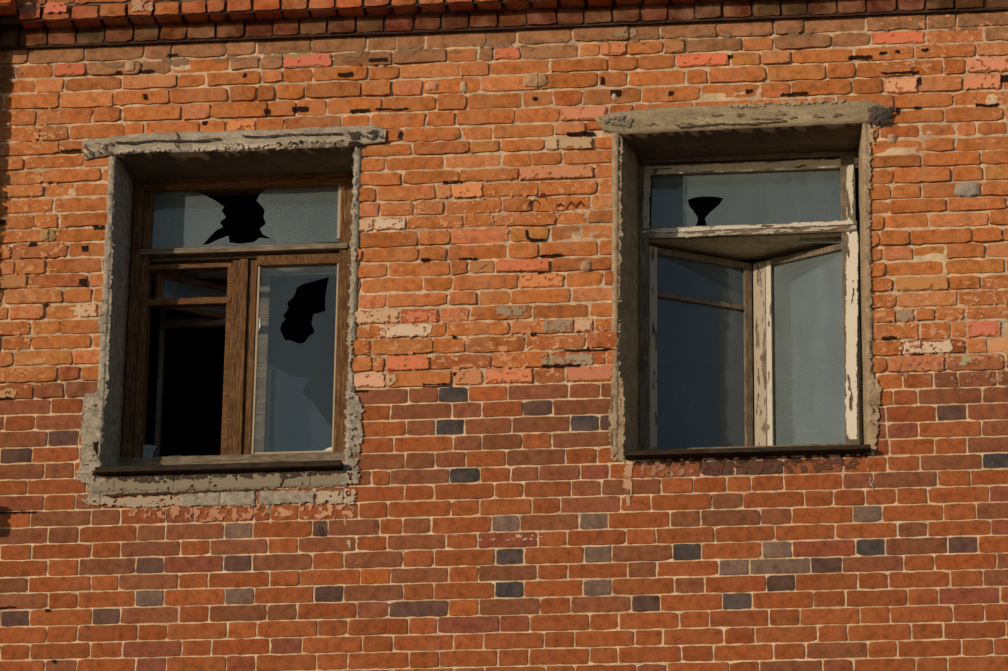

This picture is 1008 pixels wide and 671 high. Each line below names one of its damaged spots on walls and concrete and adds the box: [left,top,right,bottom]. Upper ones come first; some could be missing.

spalling [452,183,483,198]
spalling [359,217,406,232]
spalling [496,258,563,288]
peeling [642,158,859,439]
spalling [355,309,398,325]
spalling [576,319,592,332]
spalling [967,320,1008,352]
spalling [354,355,429,388]
spalling [452,368,533,384]
spalling [566,365,613,382]